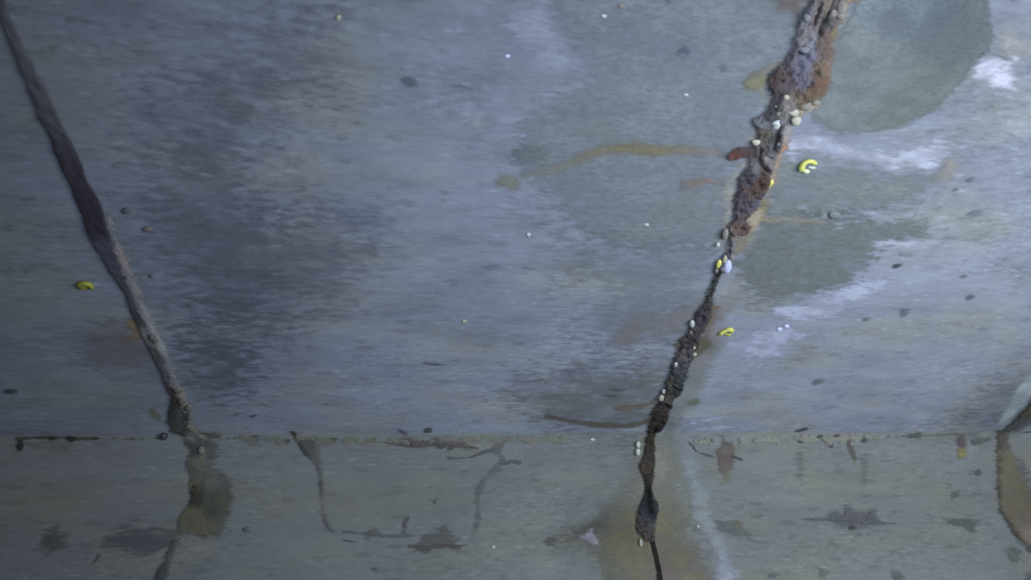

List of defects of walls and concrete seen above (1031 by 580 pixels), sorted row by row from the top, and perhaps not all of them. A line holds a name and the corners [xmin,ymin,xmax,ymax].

crack [0,0,568,580]
leakage [474,0,809,267]
crack [635,0,859,580]
leakage [725,0,1018,359]
crack [739,405,1031,553]